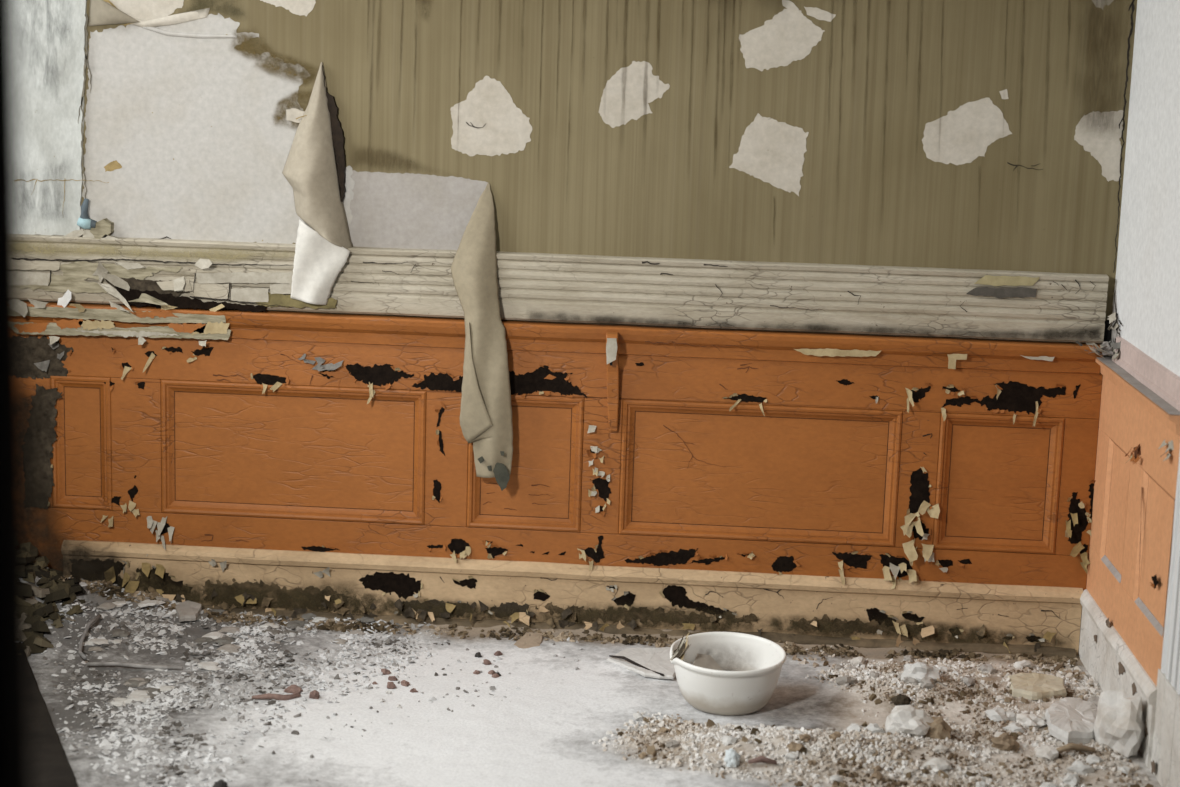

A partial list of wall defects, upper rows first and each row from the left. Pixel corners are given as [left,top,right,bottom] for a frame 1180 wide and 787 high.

peeling [739,0,836,71]
peeling [81,0,316,244]
peeling [450,76,532,156]
peeling [598,61,670,128]
peeling [729,113,809,196]
peeling [922,89,1012,165]
peeling [20,259,337,509]
peeling [509,365,587,398]
peeling [905,381,1080,427]
peeling [625,548,755,566]
peeling [832,467,972,589]
peeling [85,554,763,661]